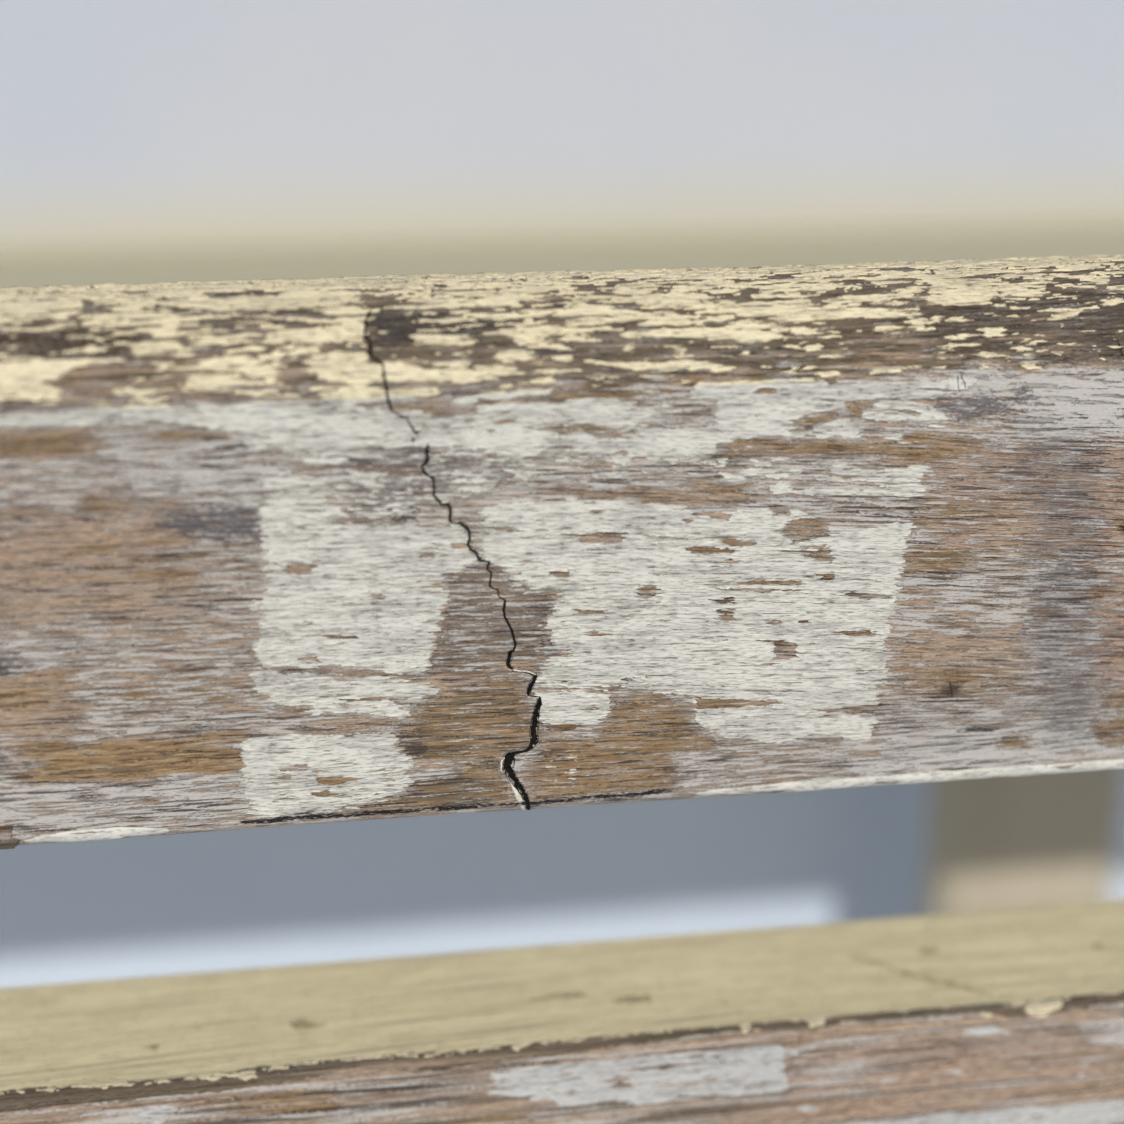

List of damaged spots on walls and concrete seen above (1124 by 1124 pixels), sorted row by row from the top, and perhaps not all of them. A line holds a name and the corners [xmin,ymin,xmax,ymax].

crack [364,305,542,810]
peeling [0,255,1124,818]
peeling [0,991,1124,1124]